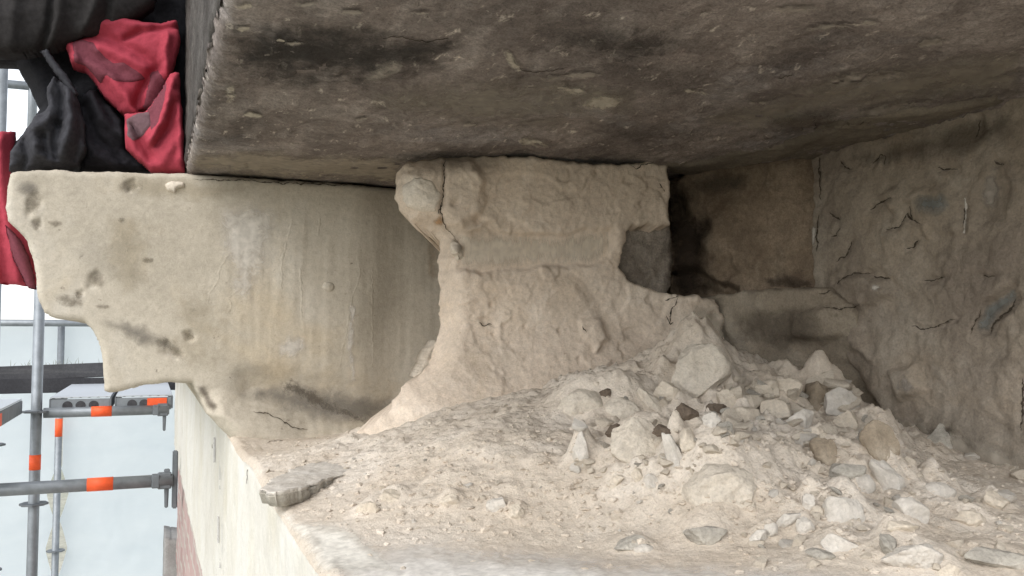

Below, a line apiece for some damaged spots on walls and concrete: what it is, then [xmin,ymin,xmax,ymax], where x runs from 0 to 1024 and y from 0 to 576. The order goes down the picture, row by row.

damp [207,212,293,313]
crack [438,161,456,240]
spalling [357,138,724,435]
crack [815,154,890,310]
crack [870,198,920,249]
crack [915,299,1016,332]
damp [261,392,381,418]